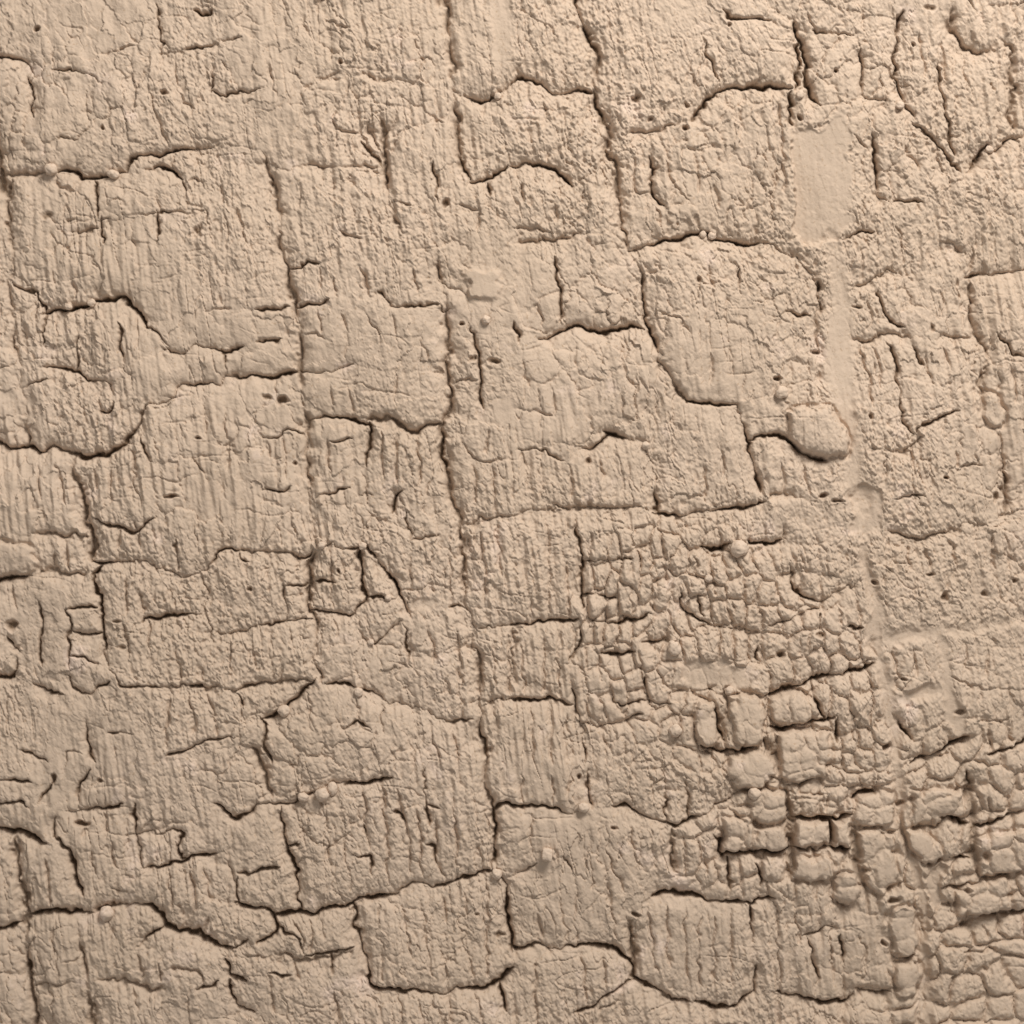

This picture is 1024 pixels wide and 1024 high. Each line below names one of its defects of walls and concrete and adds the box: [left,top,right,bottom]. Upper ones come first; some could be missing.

crack [622,20,863,137]
crack [842,7,1024,456]
crack [0,0,826,1015]
crack [887,425,1024,543]
crack [677,525,860,660]
crack [612,623,878,947]
crack [892,714,1024,929]
crack [775,924,892,1006]
crack [891,915,927,1009]